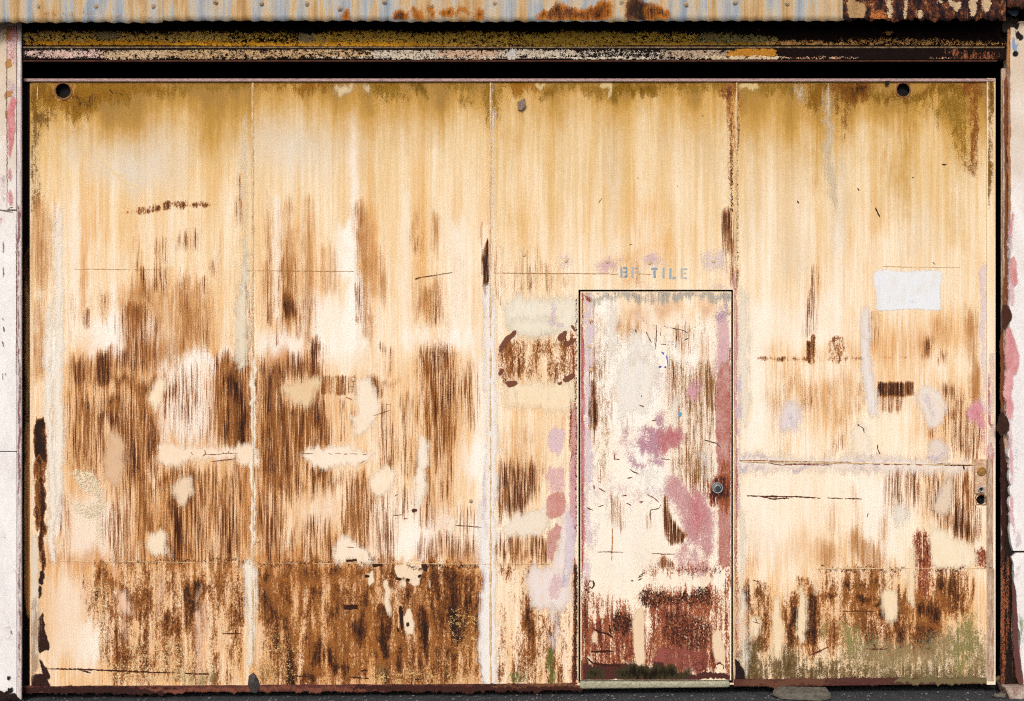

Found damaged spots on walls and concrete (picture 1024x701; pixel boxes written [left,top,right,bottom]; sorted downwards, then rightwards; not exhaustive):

rust [392,5,485,20]
rust [17,193,986,696]
rust [536,0,672,20]
peeling [545,248,768,660]
rust [718,83,742,287]
rust [739,29,1024,693]